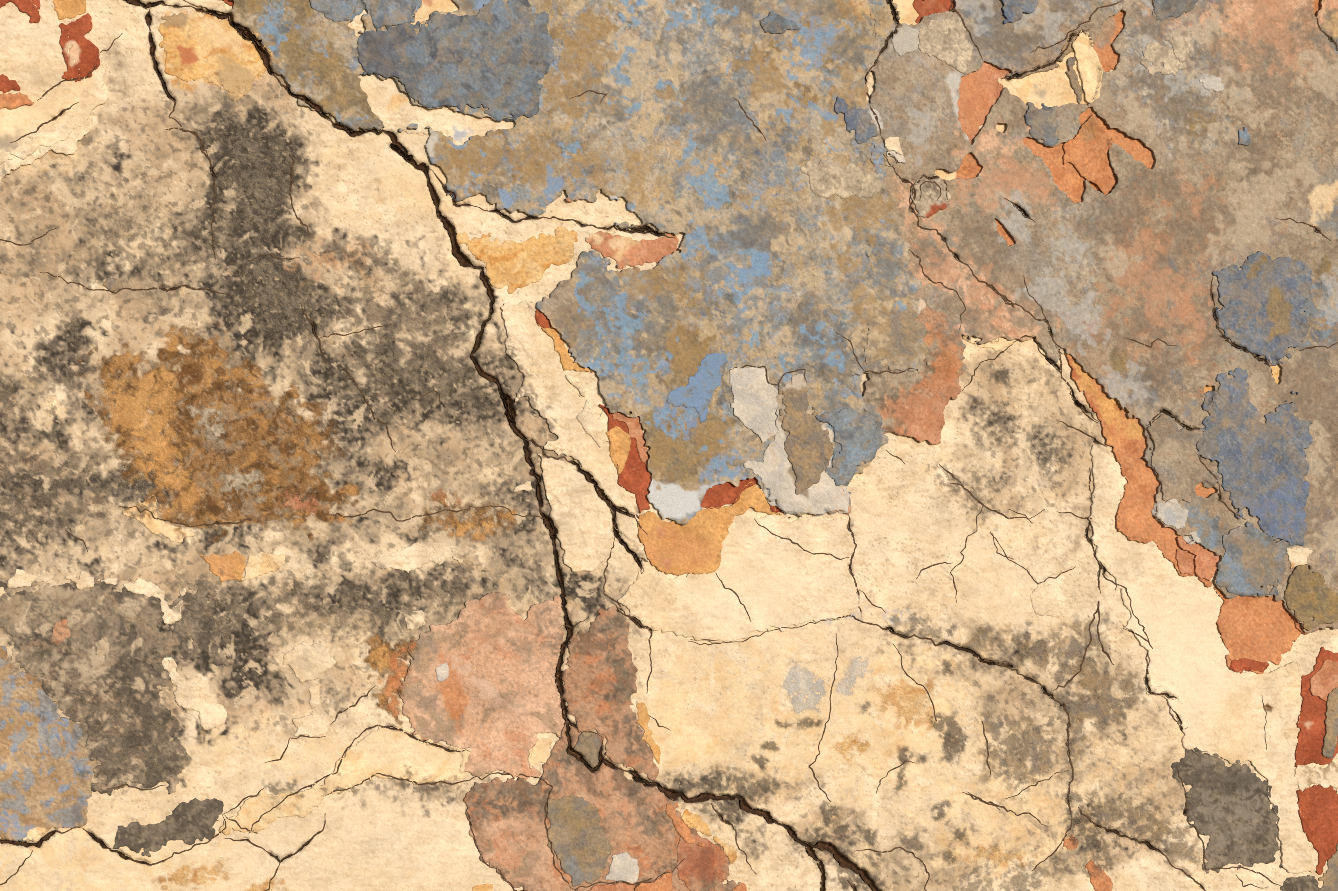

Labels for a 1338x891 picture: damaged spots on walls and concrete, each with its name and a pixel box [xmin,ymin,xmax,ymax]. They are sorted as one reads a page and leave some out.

peeling [0,0,108,184]
peeling [158,12,268,102]
leakage [216,126,296,225]
leakage [243,258,313,338]
peeling [184,0,1338,643]
peeling [123,495,195,543]
crack [0,0,930,891]
crack [688,0,1283,891]
peeling [0,646,97,843]
leakage [0,569,234,796]
peeling [219,592,748,891]
peeling [1088,445,1338,874]